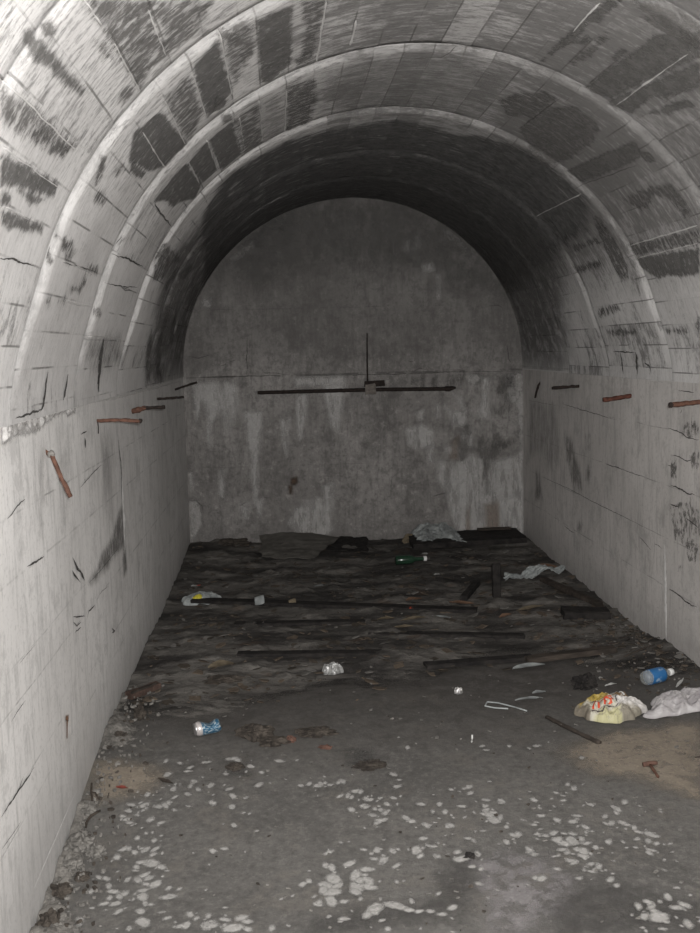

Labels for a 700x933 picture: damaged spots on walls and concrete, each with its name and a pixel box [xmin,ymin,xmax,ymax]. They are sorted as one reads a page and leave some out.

crack [16,374,68,418]
damp [296,377,344,433]
damp [294,486,331,535]